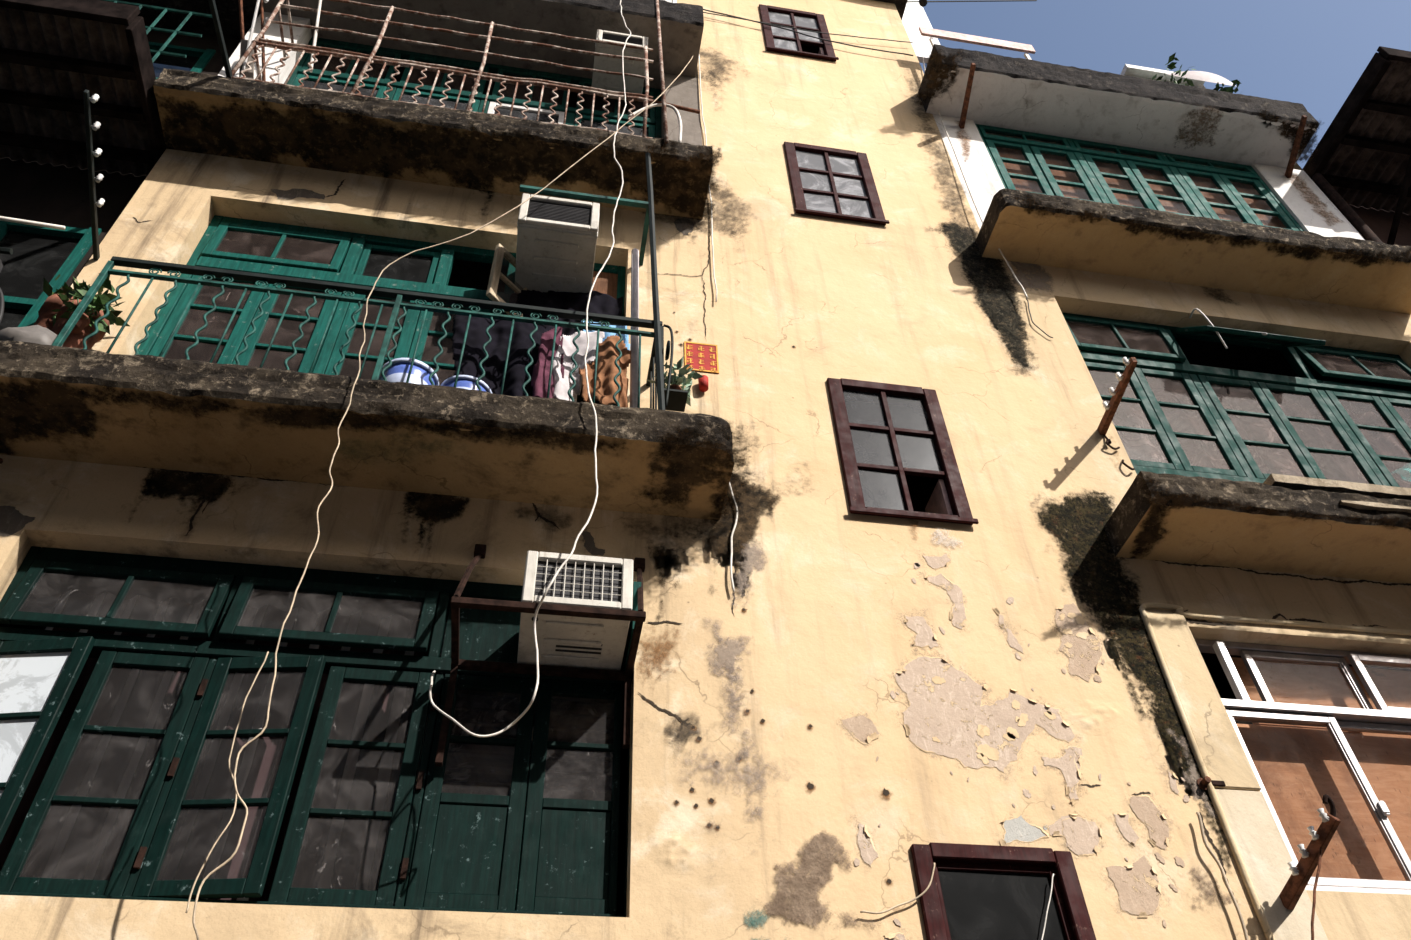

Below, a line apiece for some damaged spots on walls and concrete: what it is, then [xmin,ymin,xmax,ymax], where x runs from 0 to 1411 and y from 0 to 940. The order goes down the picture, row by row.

water stain [154,93,722,237]
water stain [0,378,626,455]
flaking render [0,505,36,537]
water stain [142,468,233,511]
water stain [404,492,469,549]
water stain [640,422,780,595]
crack [1127,558,1411,586]
water stain [684,624,768,815]
peeling [890,553,1185,928]
water stain [1106,632,1231,867]
peeling [1164,770,1190,802]
water stain [744,832,873,940]